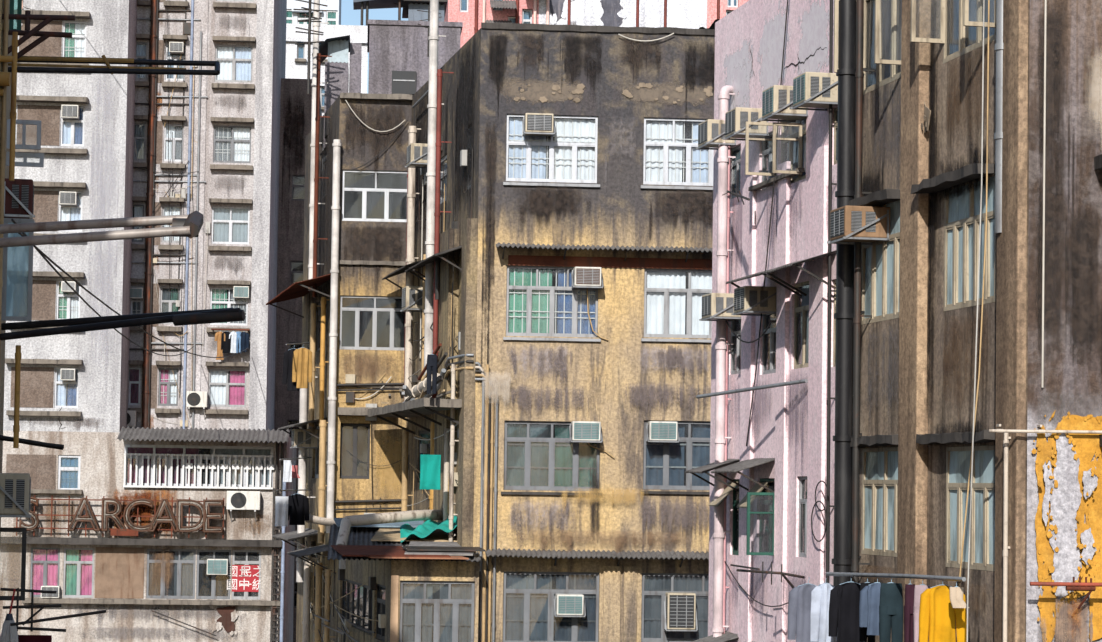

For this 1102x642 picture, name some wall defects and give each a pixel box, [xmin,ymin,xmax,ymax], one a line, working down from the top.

leakage [560,22,601,87]
leakage [622,38,660,74]
crack [784,47,827,69]
peeling [505,79,585,103]
leakage [455,35,589,413]
corrosion [114,490,172,532]
peeling [1031,411,1102,642]